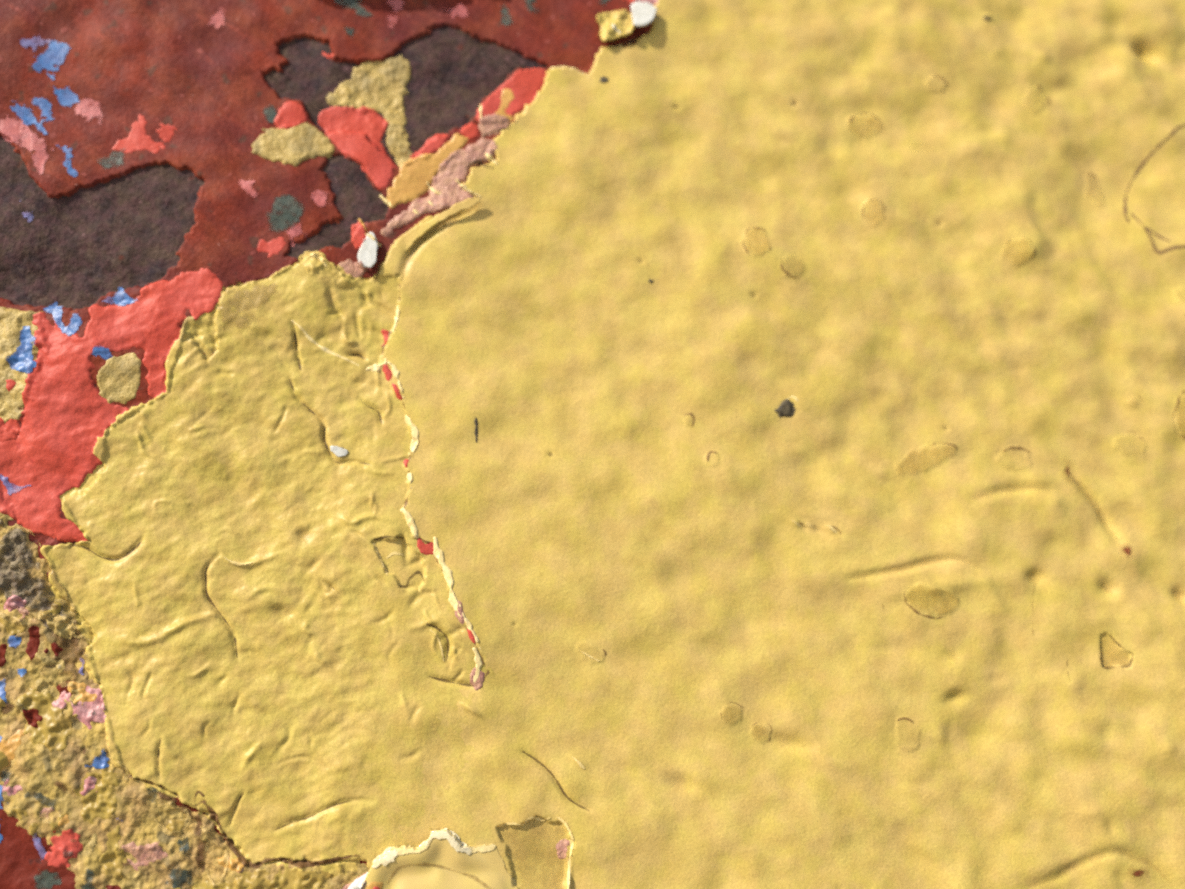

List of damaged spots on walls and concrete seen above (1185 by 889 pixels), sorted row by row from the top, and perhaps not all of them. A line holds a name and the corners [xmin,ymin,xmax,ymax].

peeling [0,0,658,889]